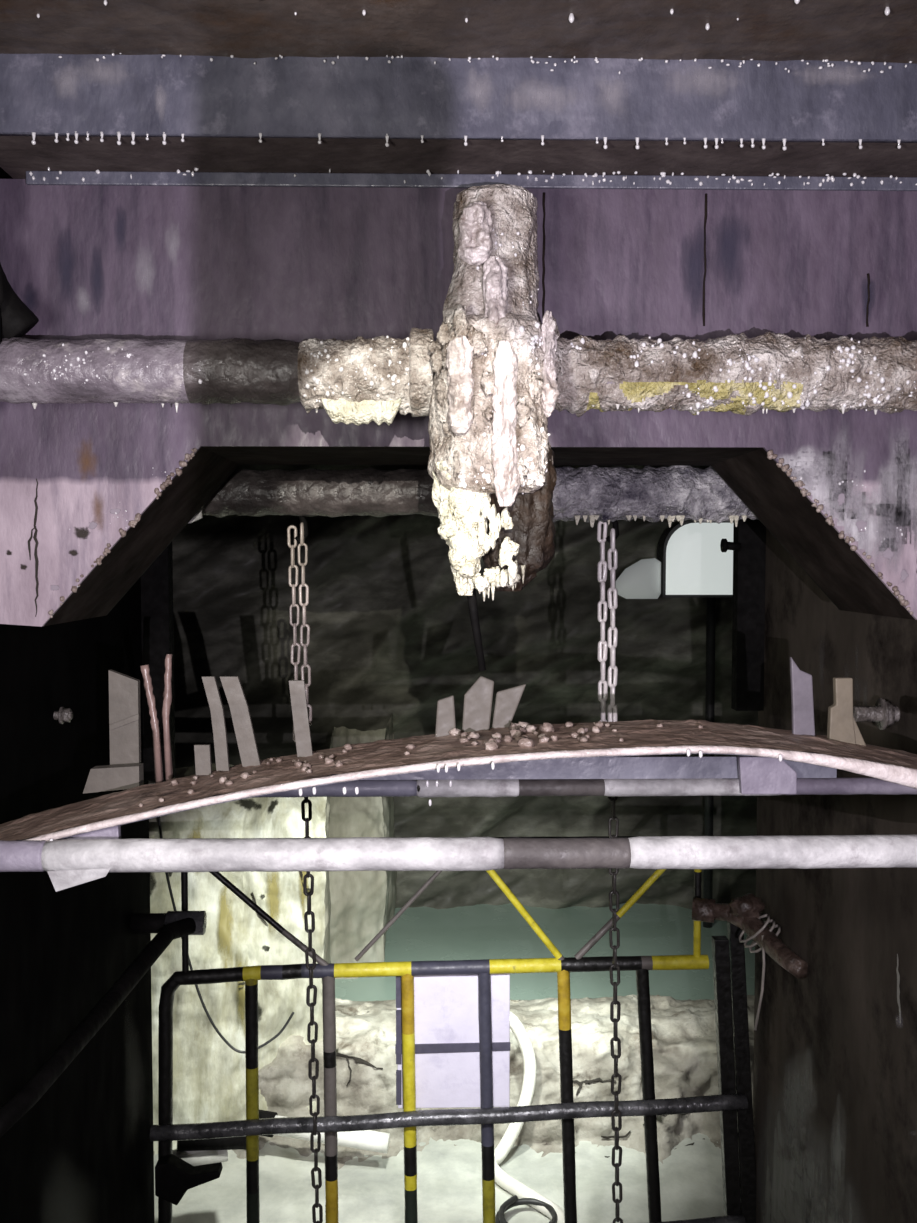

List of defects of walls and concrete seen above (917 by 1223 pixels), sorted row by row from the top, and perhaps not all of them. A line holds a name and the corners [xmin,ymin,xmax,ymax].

crack [28,479,39,617]
leakage [236,799,278,812]
leakage [218,888,262,1033]
leakage [261,874,279,919]